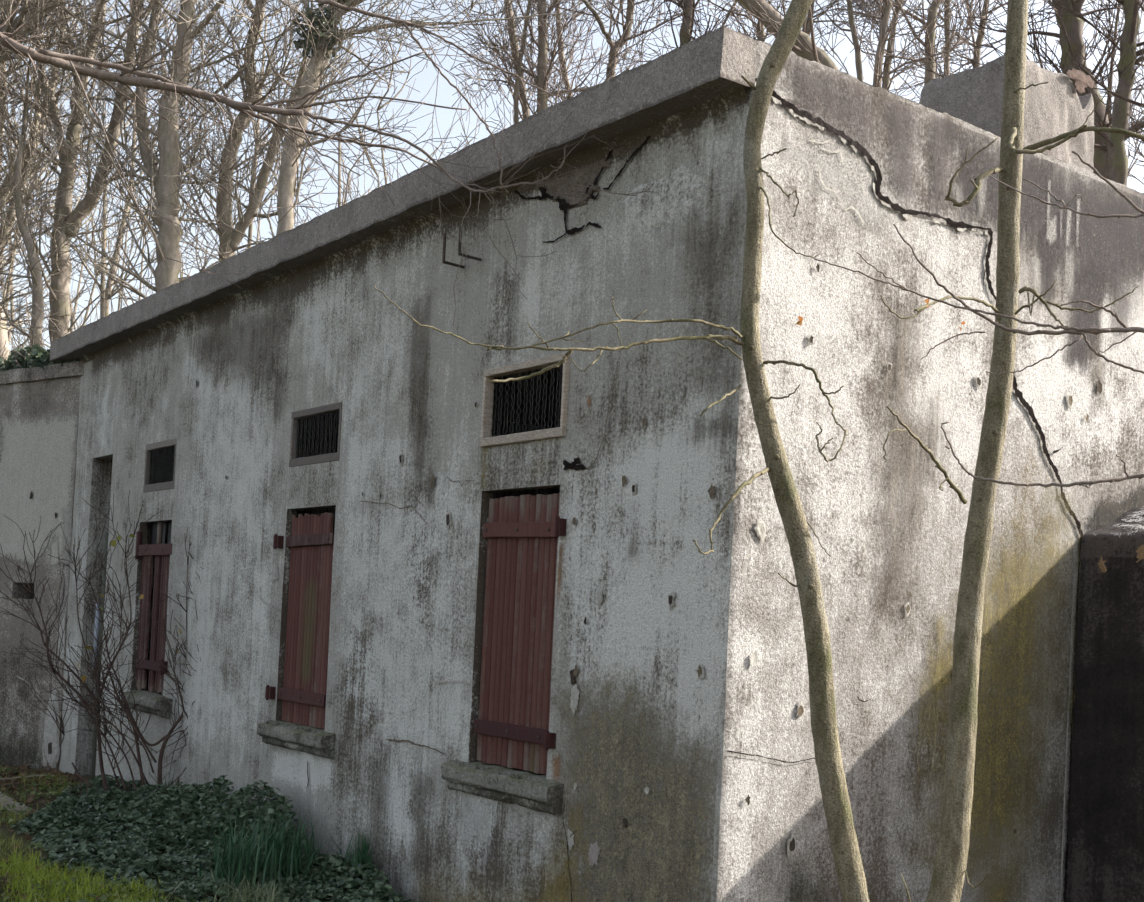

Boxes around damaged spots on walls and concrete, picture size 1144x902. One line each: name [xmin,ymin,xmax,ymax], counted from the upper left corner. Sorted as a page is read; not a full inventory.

crack [514,135,651,243]
crack [755,78,996,300]
water stain [1019,154,1144,404]
water stain [410,299,432,503]
crack [1013,369,1083,902]
peeling [1094,510,1144,563]
water stain [556,675,717,902]
crack [727,751,815,763]